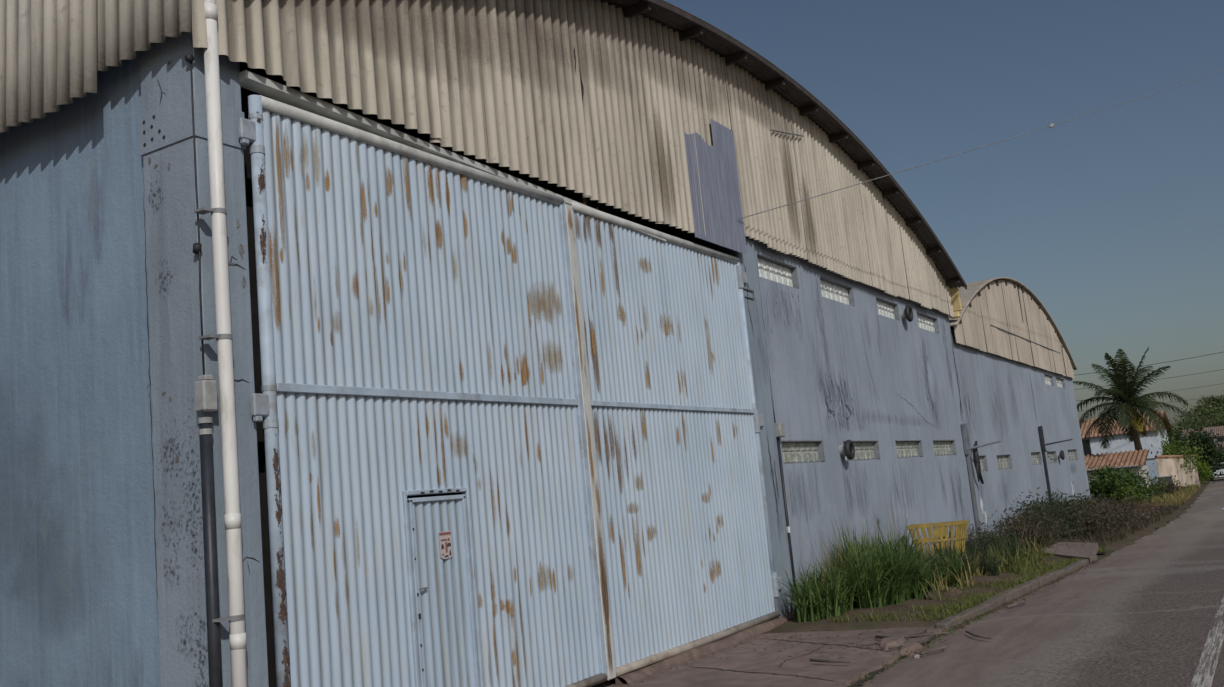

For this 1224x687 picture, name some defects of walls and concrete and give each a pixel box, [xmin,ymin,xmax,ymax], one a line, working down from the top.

rust [269,126,330,326]
rust [353,156,411,319]
rust [428,166,467,211]
rust [499,232,517,262]
rust [568,197,620,295]
rust [695,238,718,293]
rust [490,348,560,386]
rust [575,299,600,391]
rust [418,418,466,484]
rust [310,475,321,542]
rust [588,412,651,669]
rust [478,569,570,687]